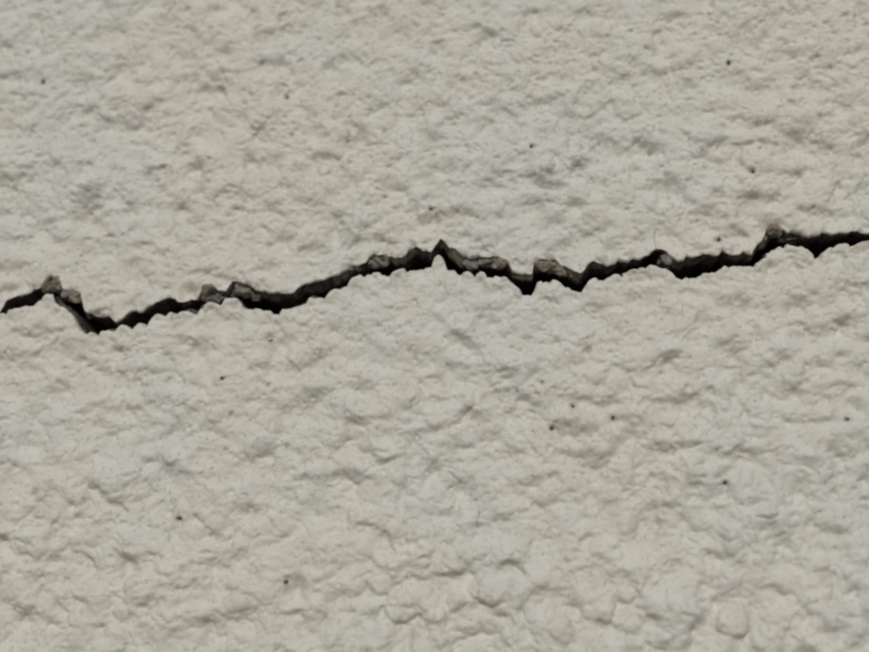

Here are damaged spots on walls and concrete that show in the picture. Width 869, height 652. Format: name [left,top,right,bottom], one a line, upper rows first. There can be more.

crack [0,228,869,336]